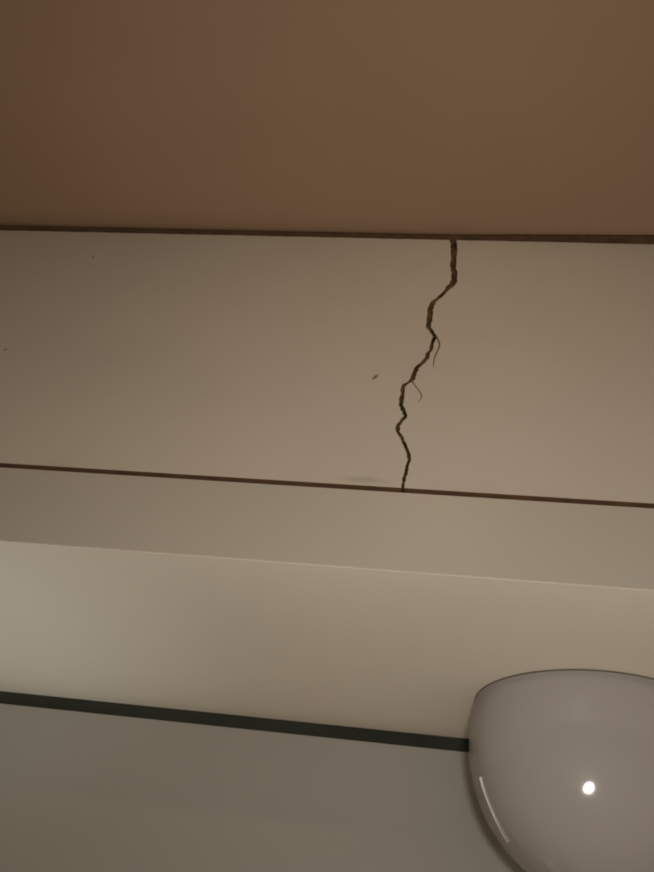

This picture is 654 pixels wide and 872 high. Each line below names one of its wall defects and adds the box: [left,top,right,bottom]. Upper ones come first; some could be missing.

crack [395,240,458,491]